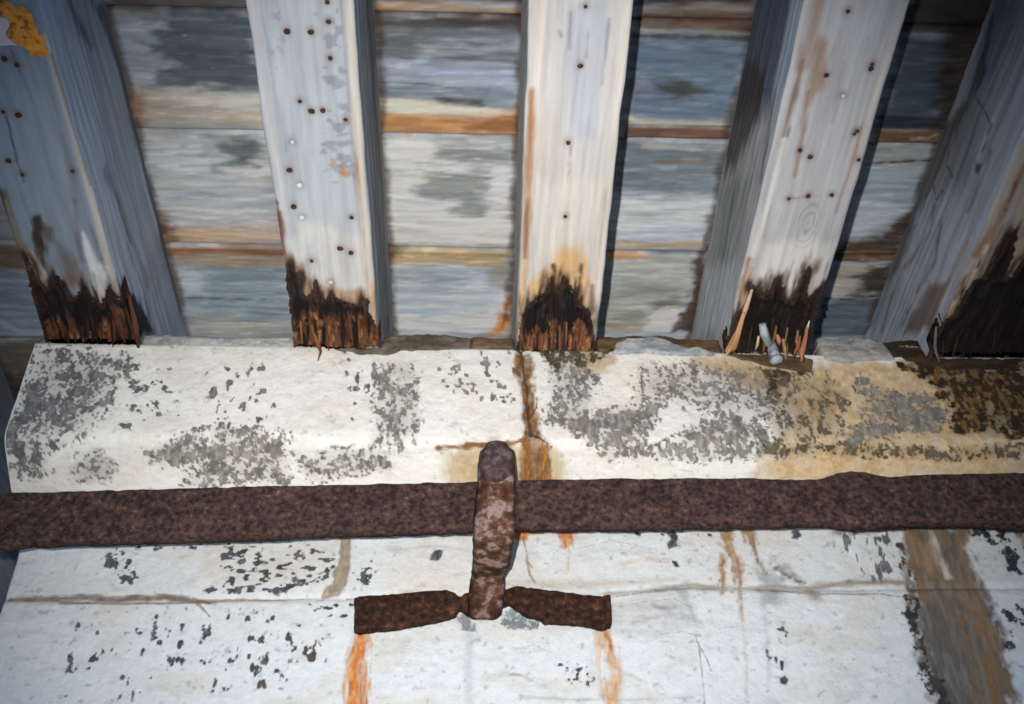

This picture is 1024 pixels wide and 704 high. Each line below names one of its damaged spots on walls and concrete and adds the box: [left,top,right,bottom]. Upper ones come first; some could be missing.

corrosion [506,354,558,481]
damp [693,358,1024,480]
corrosion [436,442,486,481]
corrosion [514,532,544,541]
corrosion [557,532,573,548]
corrosion [720,529,759,593]
damp [833,528,1024,704]
corrosion [345,634,371,704]
corrosion [593,631,621,704]